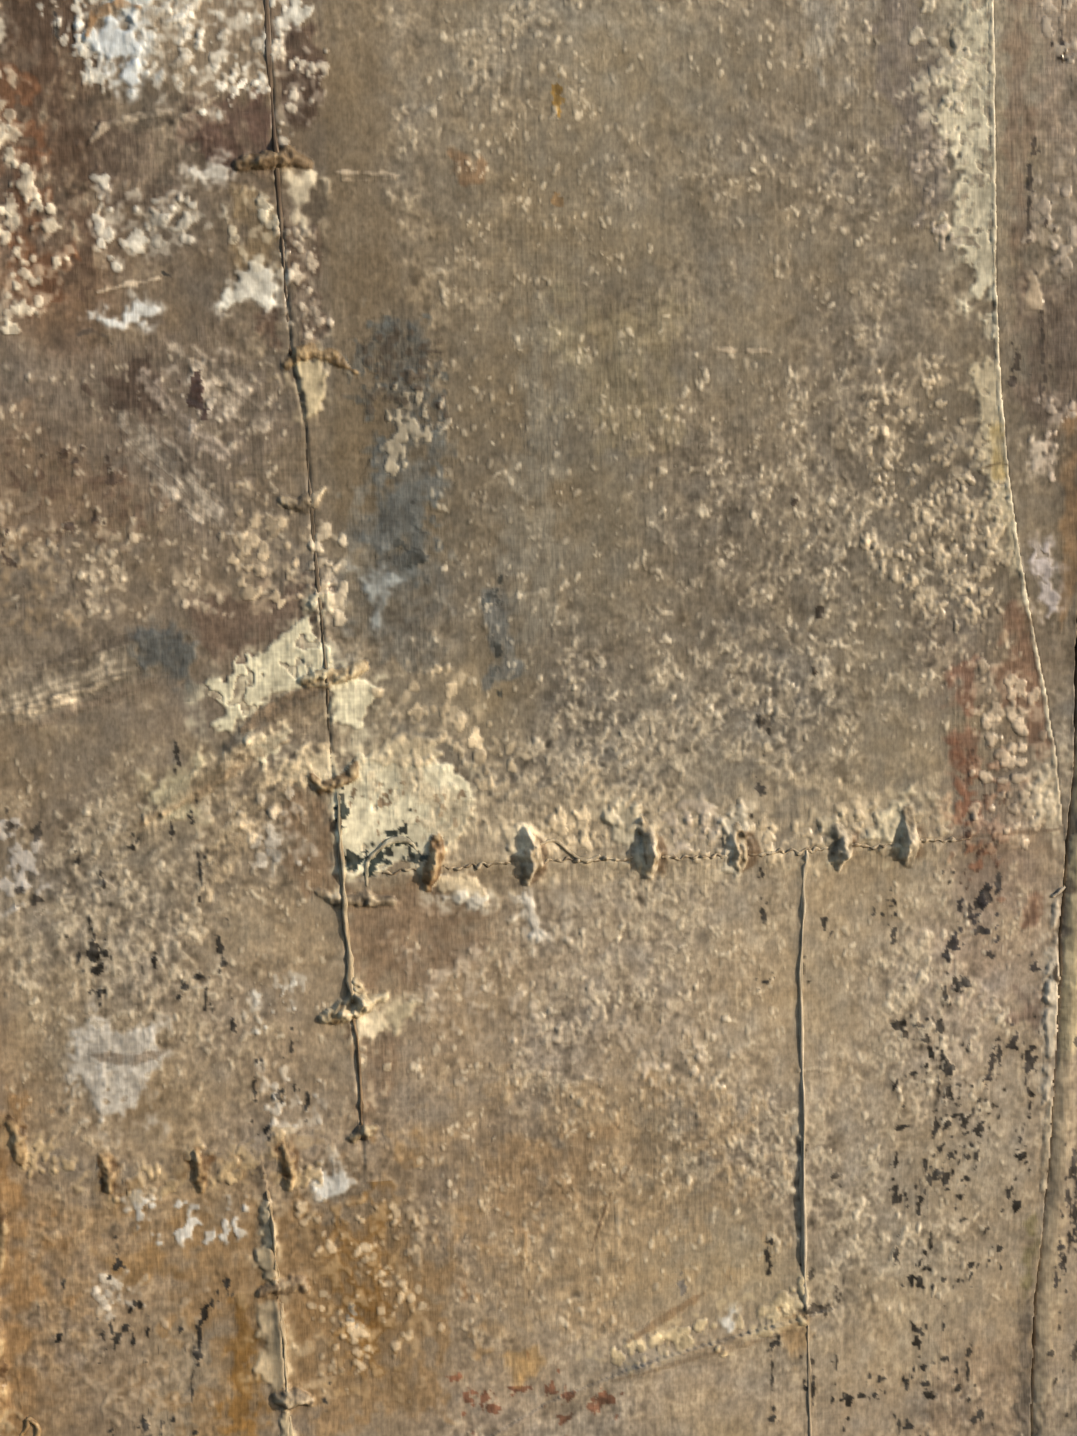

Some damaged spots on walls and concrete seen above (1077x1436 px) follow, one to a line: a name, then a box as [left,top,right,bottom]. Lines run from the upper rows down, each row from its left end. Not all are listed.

peeling [49,359,165,423]
rust [936,597,1050,891]
crack [1010,826,1062,837]
peeling [0,440,854,1436]
crack [1050,963,1061,985]